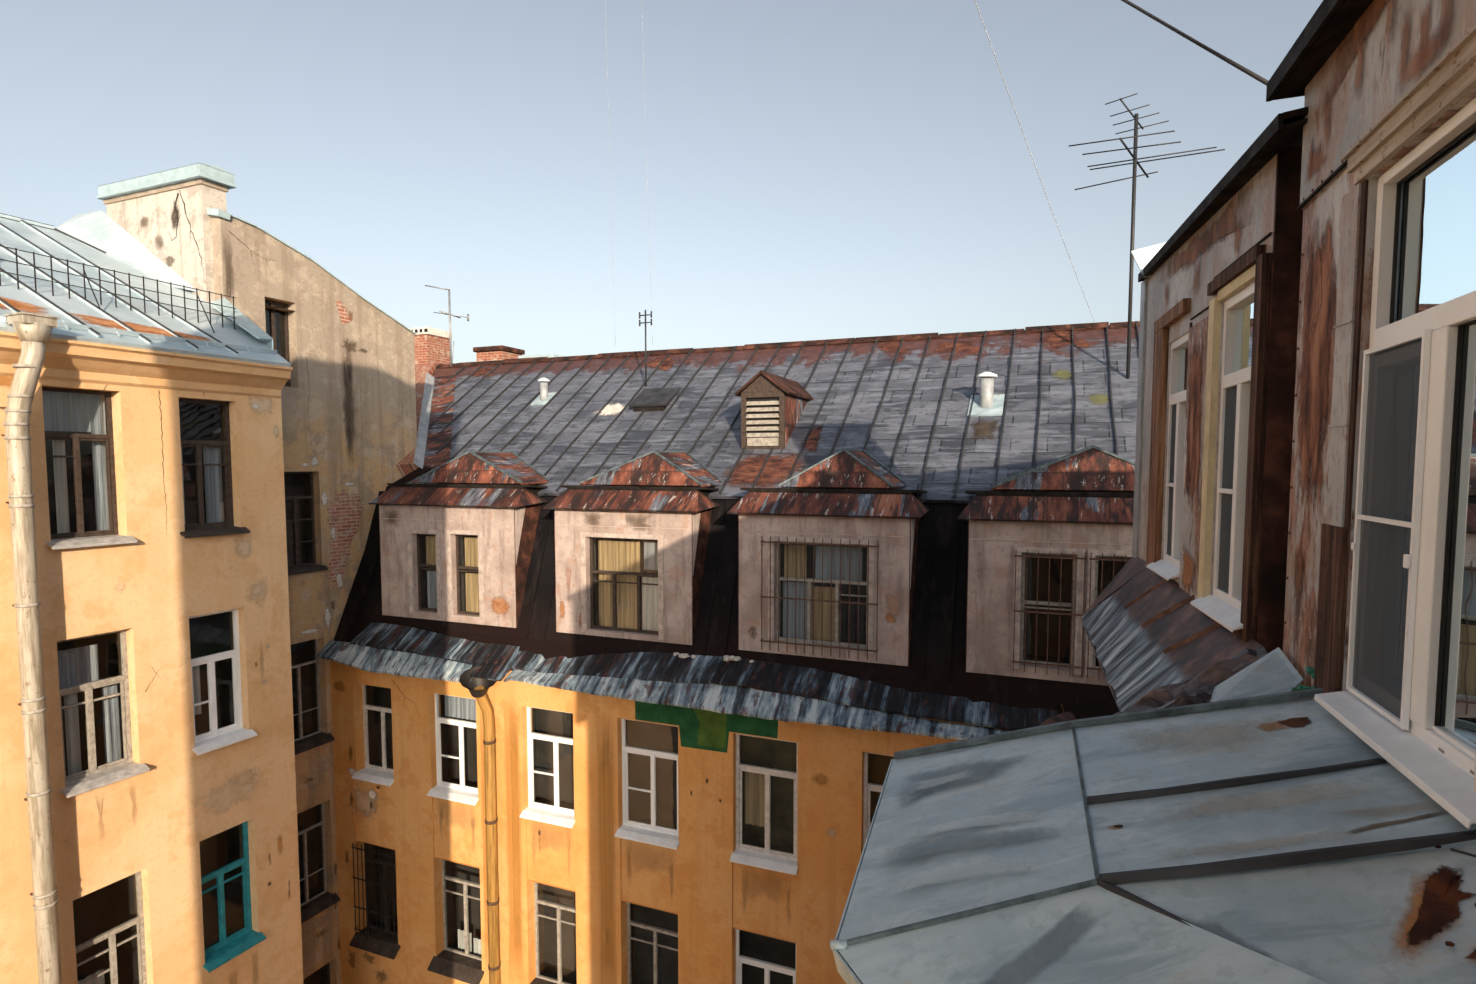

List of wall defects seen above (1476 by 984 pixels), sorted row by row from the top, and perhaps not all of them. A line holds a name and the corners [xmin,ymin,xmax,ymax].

corrosion [1308,0,1451,177]
crack [168,190,276,282]
corrosion [724,426,822,488]
corrosion [1184,341,1203,497]
flaking render [301,482,363,635]
corrosion [1182,547,1194,587]
corrosion [1260,717,1311,731]
corrosion [1398,845,1476,959]